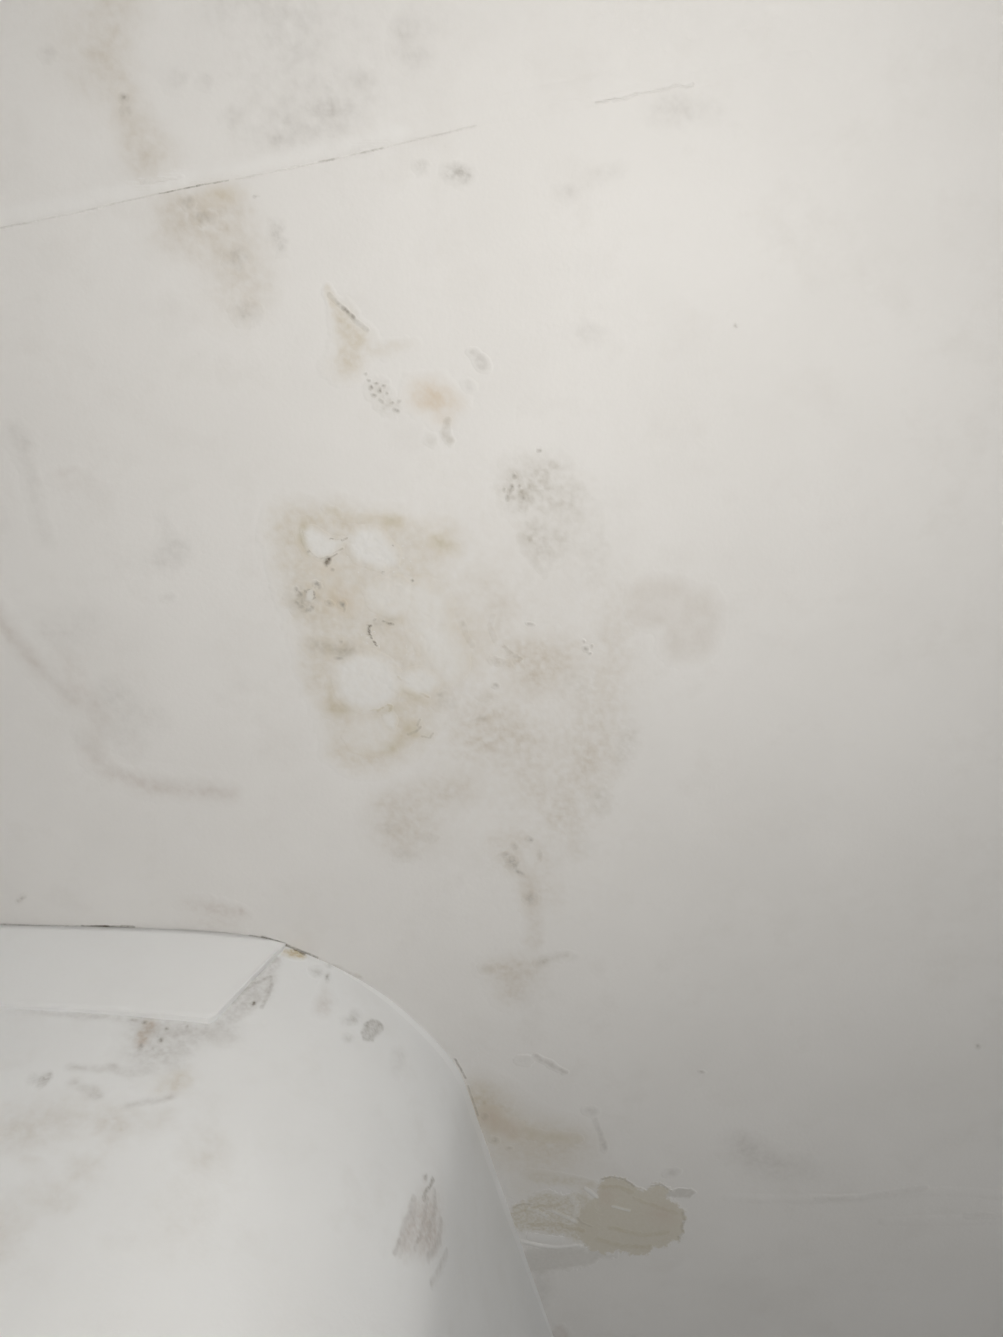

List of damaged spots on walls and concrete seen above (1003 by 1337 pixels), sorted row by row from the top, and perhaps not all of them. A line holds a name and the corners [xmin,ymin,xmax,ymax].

crack [0,124,478,230]
leakage [11,0,481,352]
leakage [337,430,730,1016]
peeling [500,1167,697,1277]